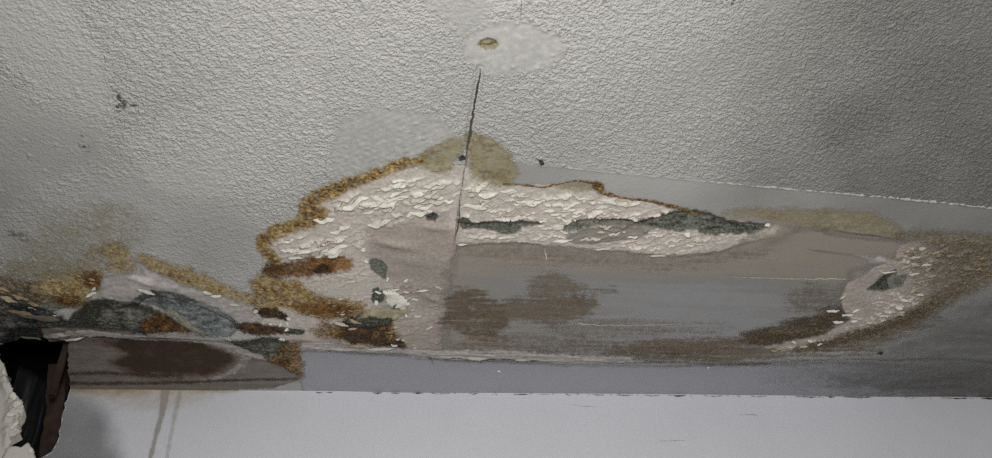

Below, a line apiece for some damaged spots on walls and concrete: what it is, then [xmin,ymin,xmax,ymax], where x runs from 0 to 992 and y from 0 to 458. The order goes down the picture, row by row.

crack [453,42,497,244]
leakage [0,134,703,458]
peeling [0,165,794,388]
leakage [441,207,992,365]
peeling [764,238,992,352]